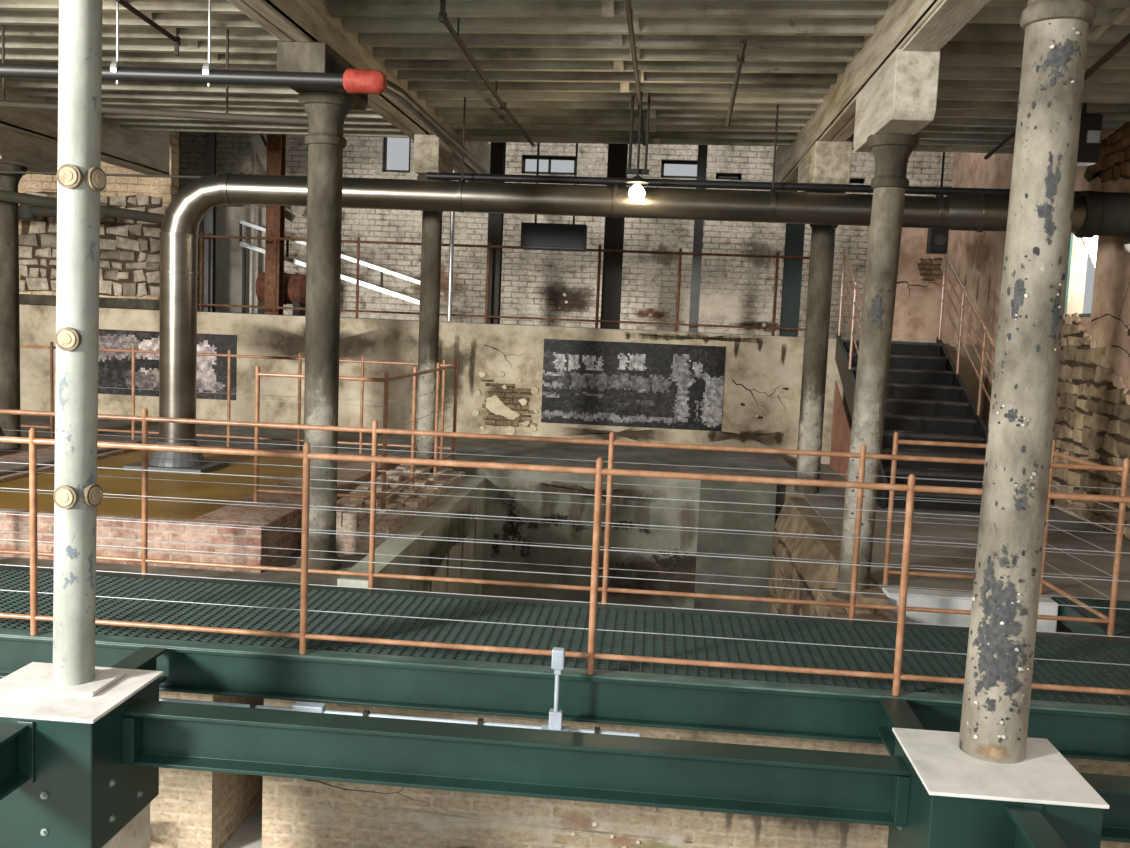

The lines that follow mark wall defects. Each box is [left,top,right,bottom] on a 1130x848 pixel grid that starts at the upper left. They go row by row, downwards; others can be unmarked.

peeling [999,143,1069,341]
peeling [1017,28,1081,129]
flaking render [1084,122,1130,183]
flaking render [472,371,539,435]
flaking render [1010,256,1130,542]
peeling [968,543,1042,743]